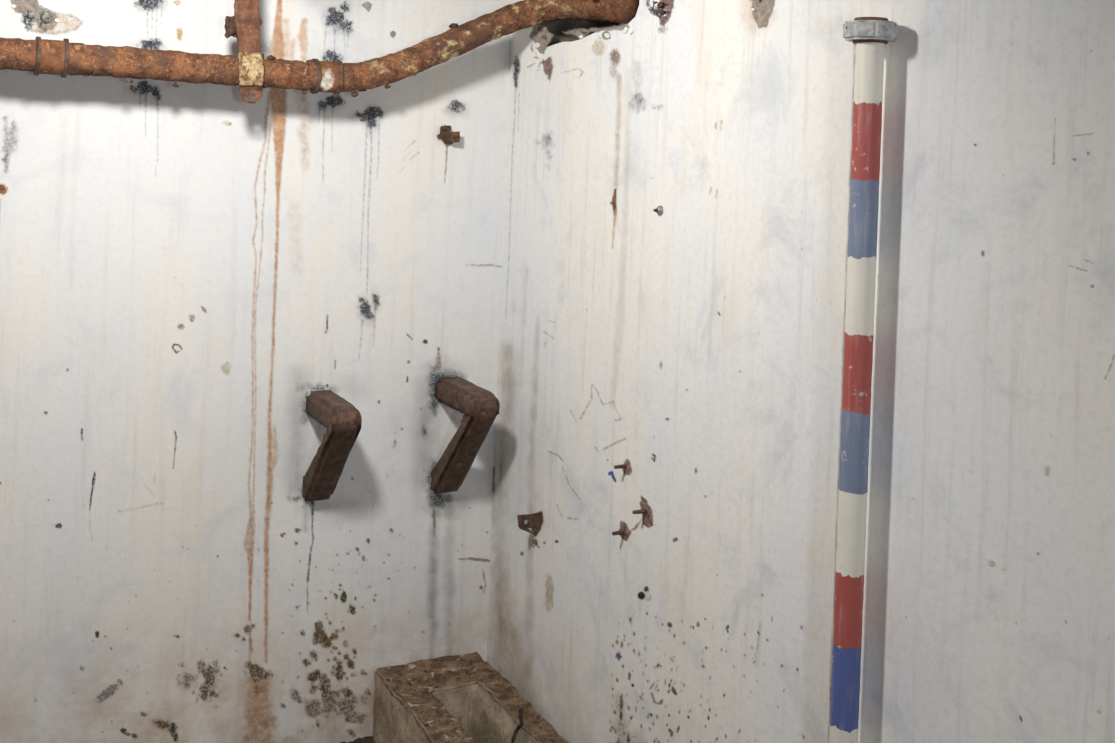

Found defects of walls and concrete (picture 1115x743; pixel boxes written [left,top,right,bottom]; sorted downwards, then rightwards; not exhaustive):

spalling [11,0,78,33]
rust [267,1,284,61]
rust [299,20,314,62]
spalling [527,24,633,80]
rust [244,88,286,743]